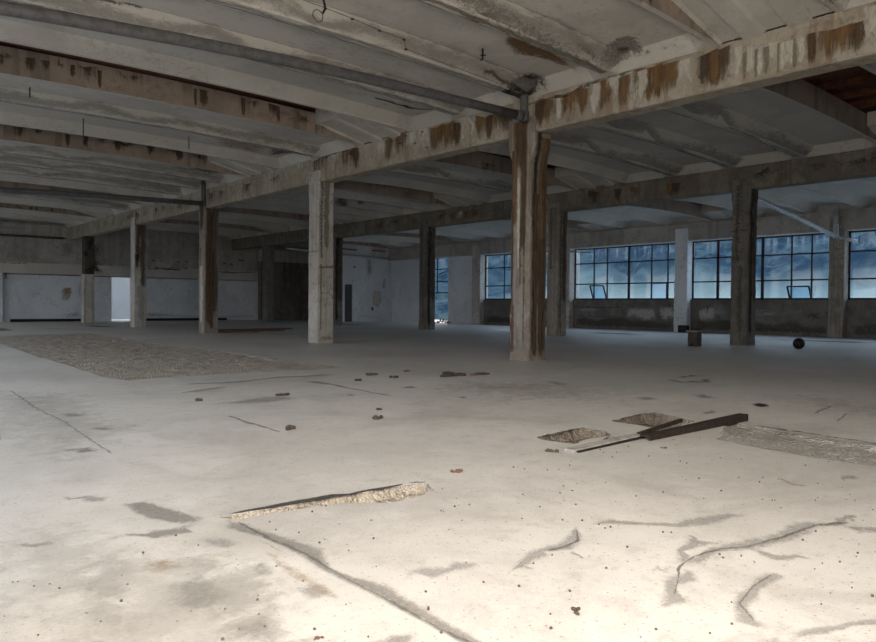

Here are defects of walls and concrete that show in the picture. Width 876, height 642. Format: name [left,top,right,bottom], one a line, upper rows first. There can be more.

rust [807,20,866,62]
rust [698,45,729,84]
rust [343,148,359,167]
rust [385,132,404,159]
rust [430,120,460,144]
crack [12,391,110,452]
spalling [537,427,611,444]
spalling [613,412,694,430]
crack [517,529,583,568]
crack [231,522,477,642]
crack [601,514,857,625]
crack [801,620,876,633]